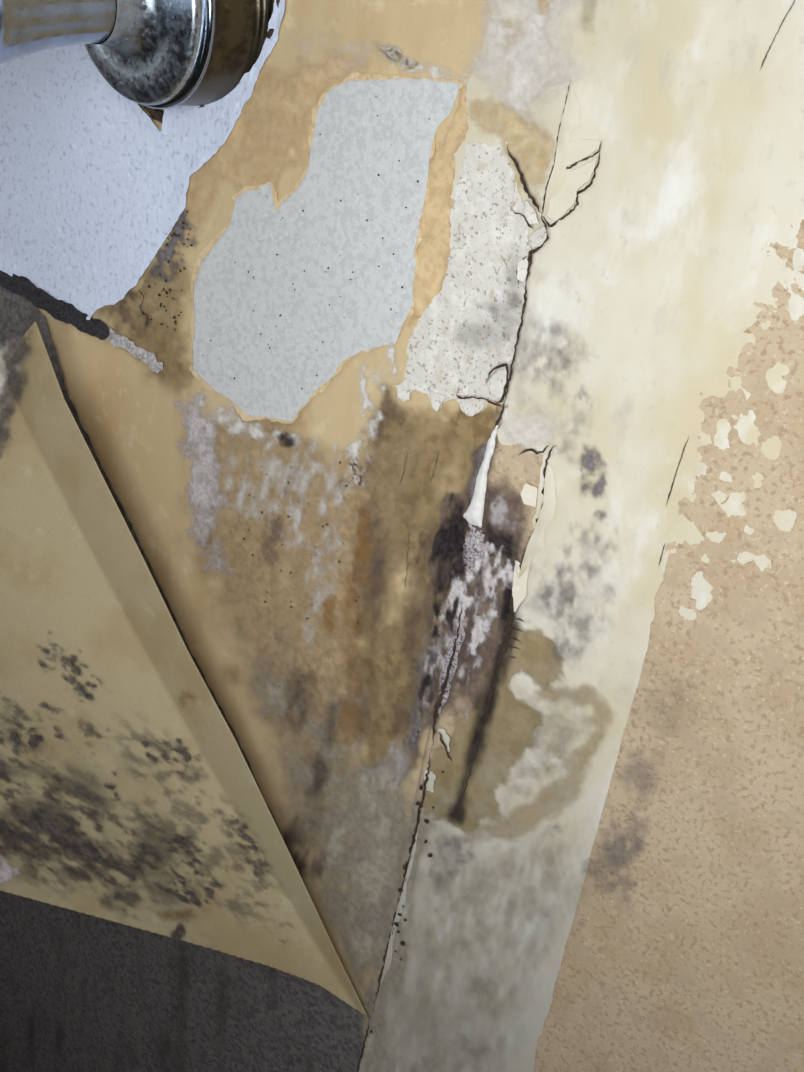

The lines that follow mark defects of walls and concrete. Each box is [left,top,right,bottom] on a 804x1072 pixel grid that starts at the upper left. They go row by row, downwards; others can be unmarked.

spalling [142,105,164,123]
peeling [175,0,570,568]
crack [456,77,602,437]
water stain [61,655,96,700]
water stain [0,707,221,942]
water stain [206,343,605,1050]
crack [357,445,557,1072]